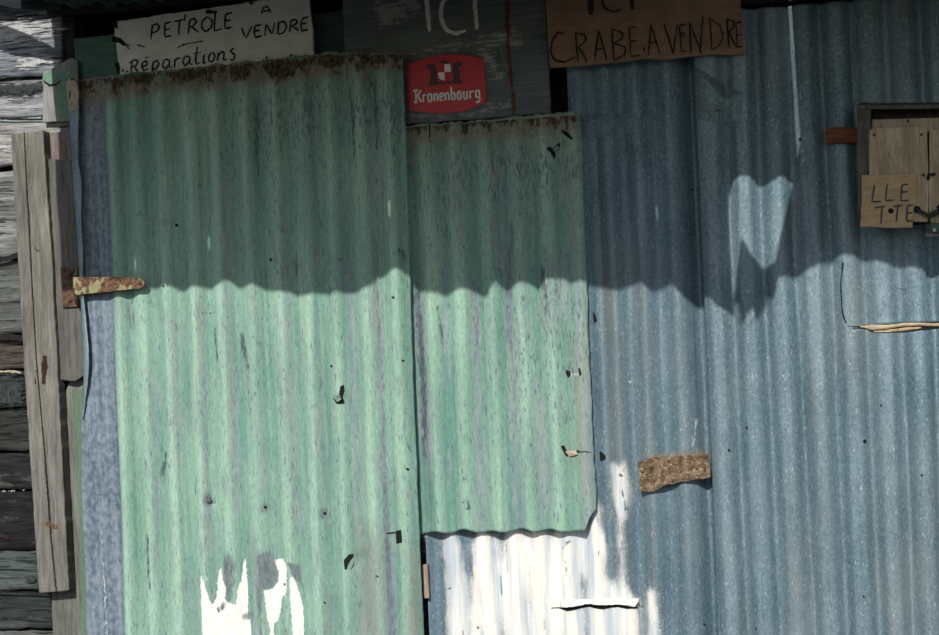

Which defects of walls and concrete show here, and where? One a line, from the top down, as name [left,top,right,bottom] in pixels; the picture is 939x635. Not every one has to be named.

rust [79,53,407,117]
crack [839,262,847,323]
peeling [200,549,305,635]